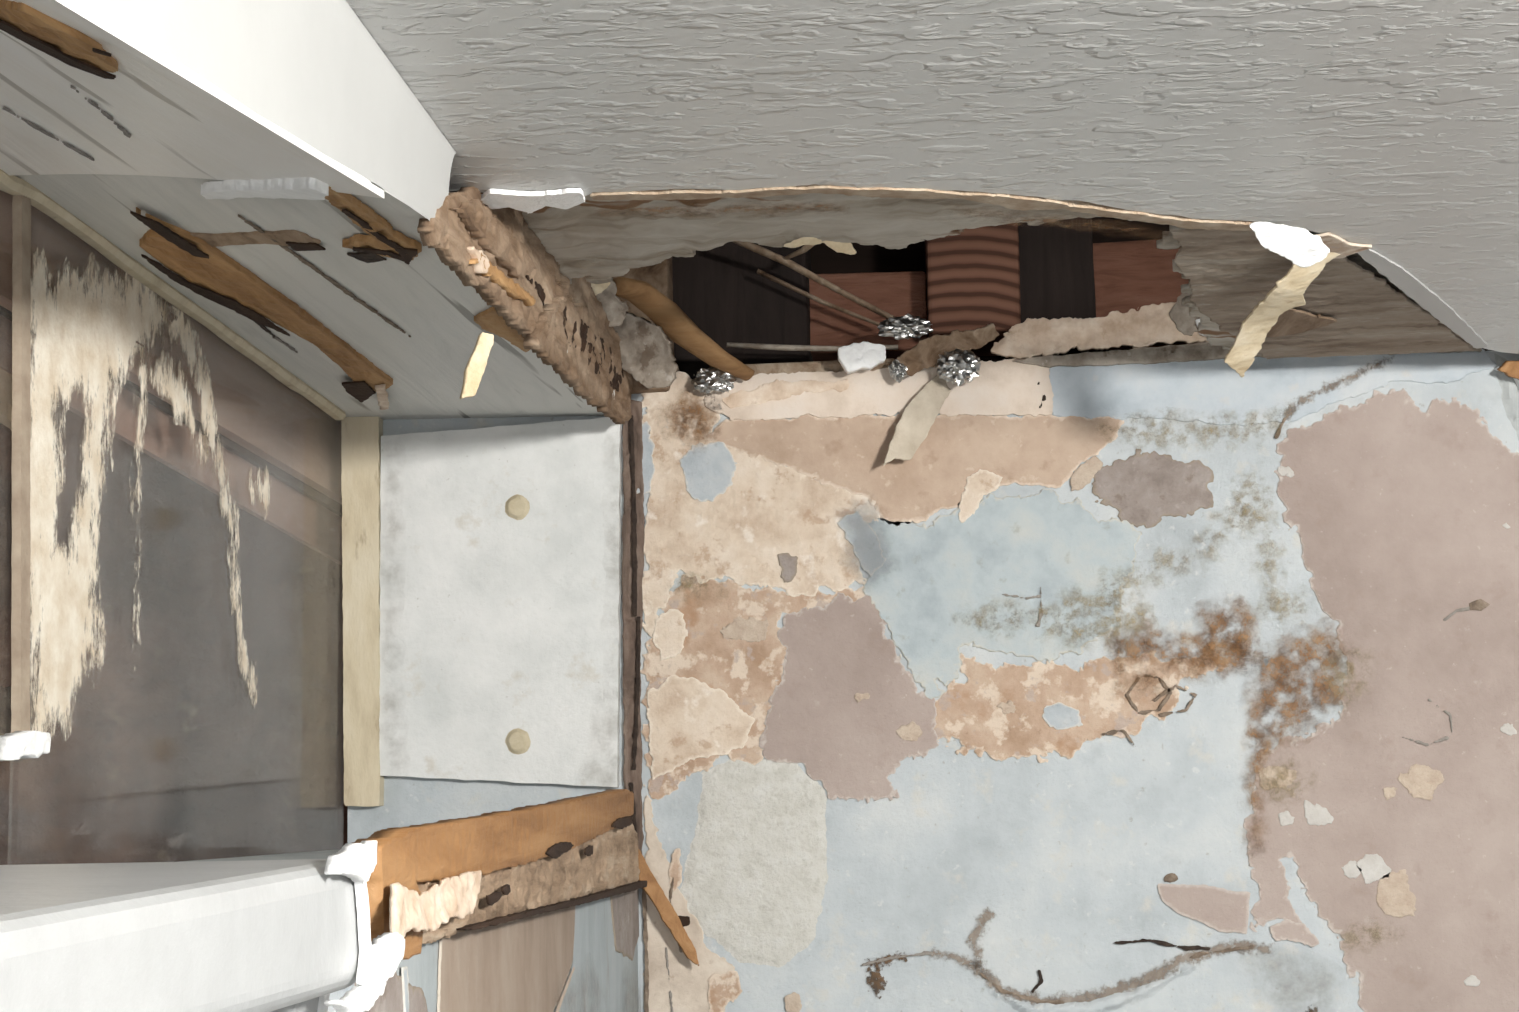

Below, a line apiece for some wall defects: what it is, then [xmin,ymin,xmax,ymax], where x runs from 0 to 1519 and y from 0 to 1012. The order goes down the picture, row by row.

peeling [201,177,329,200]
spalling [130,207,393,410]
peeling [467,246,490,274]
peeling [1224,221,1341,377]
leakage [129,296,257,705]
leakage [1040,595,1255,682]
spalling [1443,599,1490,621]
peeling [610,371,1227,1012]
peeling [1157,873,1251,934]
peeling [365,906,575,1012]
crack [862,908,1270,1005]